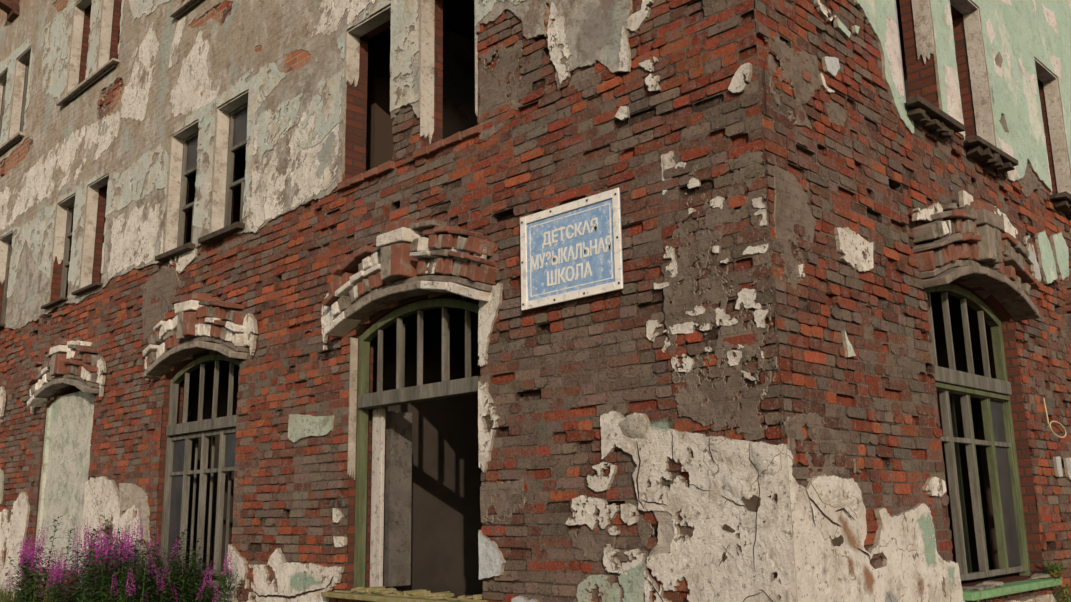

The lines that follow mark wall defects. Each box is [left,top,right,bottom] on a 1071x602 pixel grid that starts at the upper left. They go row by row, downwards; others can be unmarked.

peeling [884,15,904,97]
peeling [0,0,421,298]
peeling [993,206,1069,284]
flaking render [478,283,503,367]
flaking render [478,381,500,473]
flaking render [0,468,30,598]
flaking render [78,476,150,598]
flaking render [215,544,345,602]
peeling [478,515,506,580]
crack [636,440,667,509]
crack [672,435,773,602]
crack [805,487,855,528]